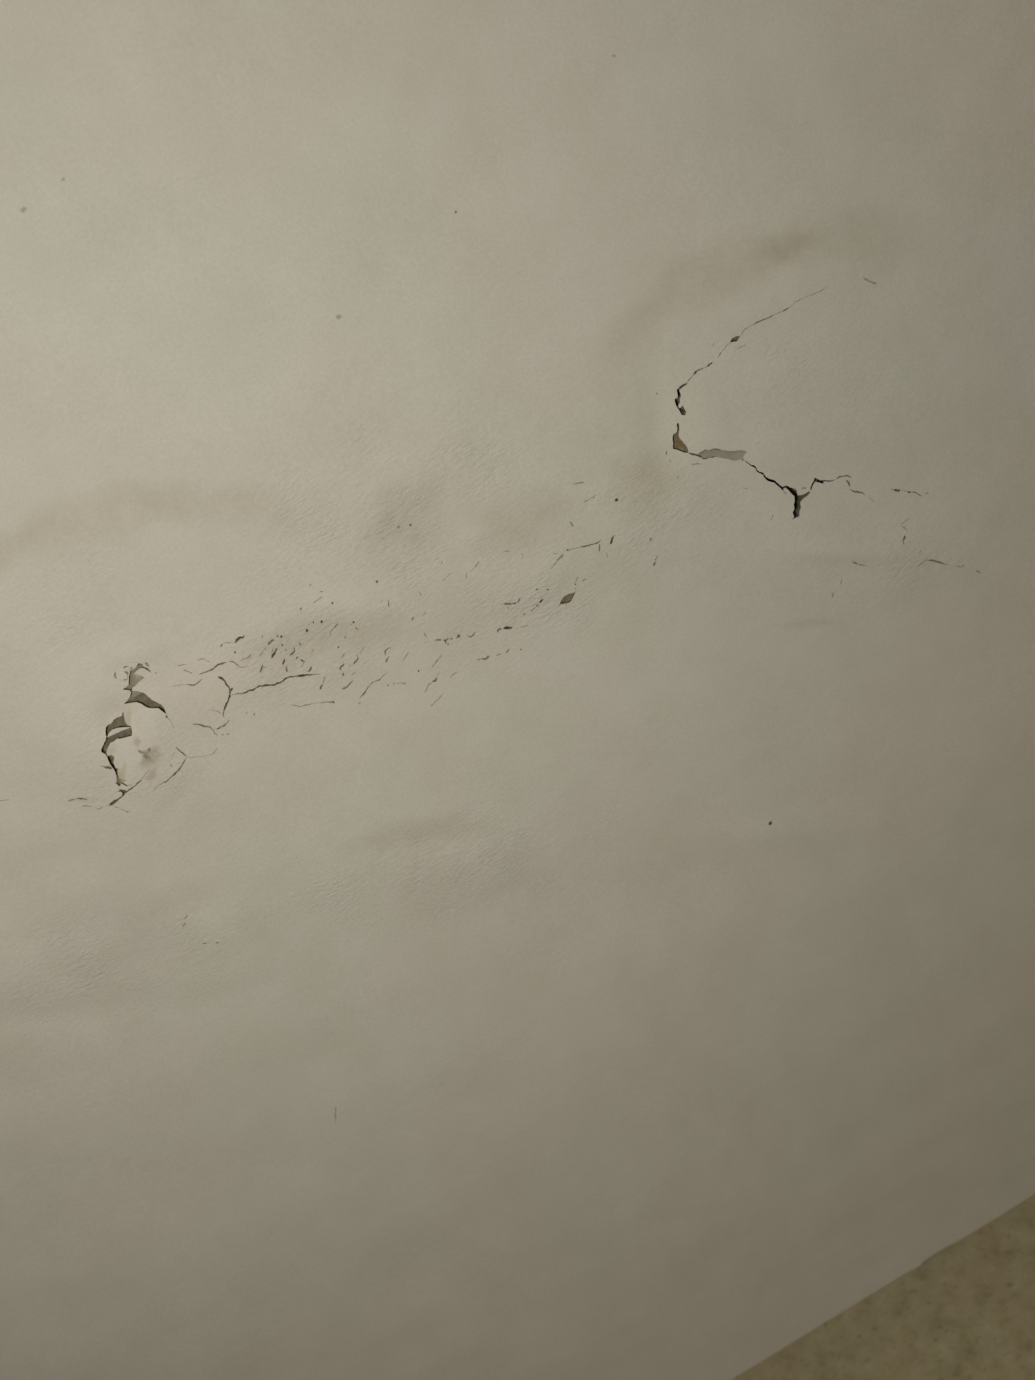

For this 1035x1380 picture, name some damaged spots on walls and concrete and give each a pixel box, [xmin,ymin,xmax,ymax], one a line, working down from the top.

crack [656,307,921,520]
peeling [101,662,167,805]
crack [160,536,614,785]